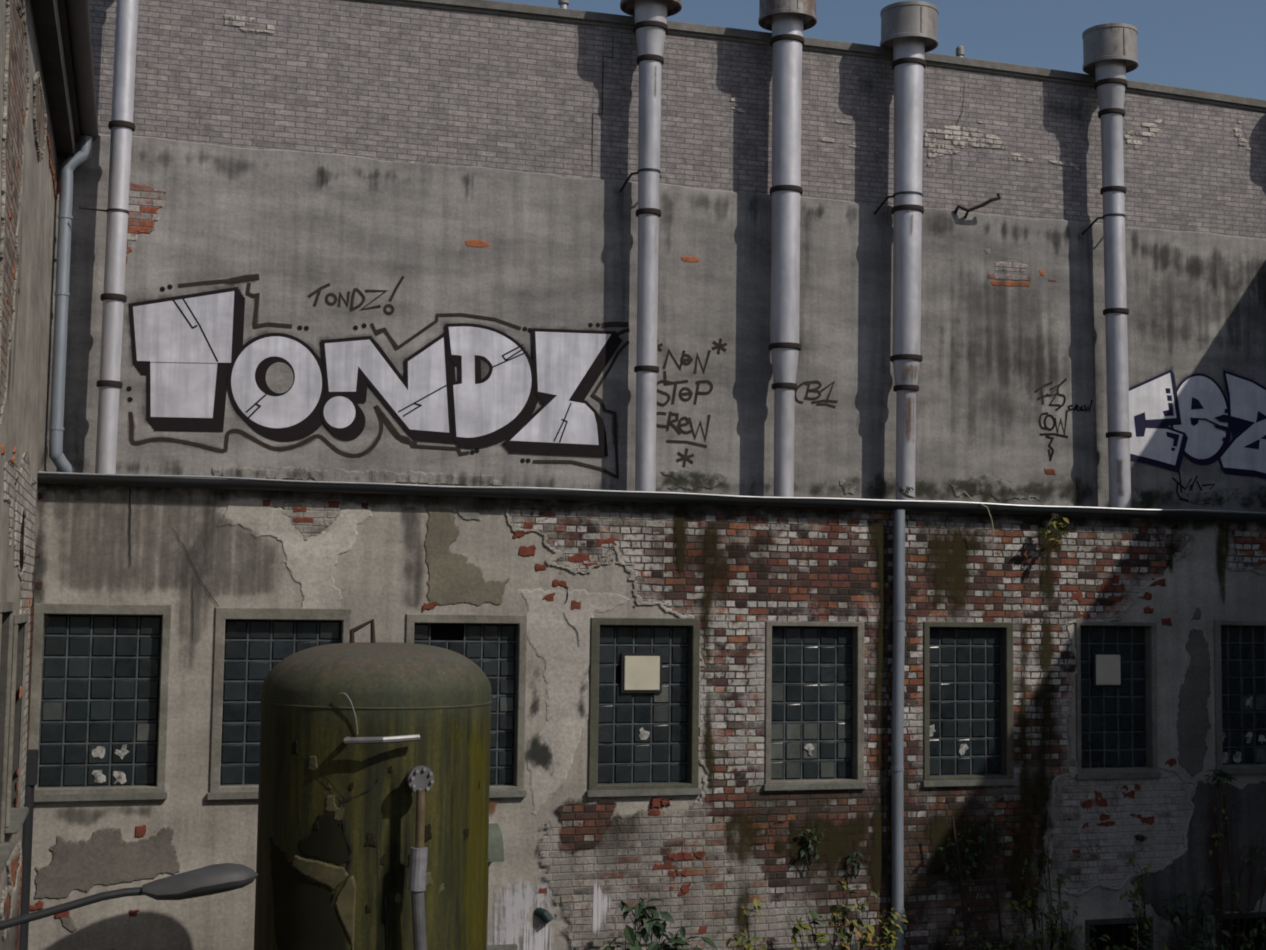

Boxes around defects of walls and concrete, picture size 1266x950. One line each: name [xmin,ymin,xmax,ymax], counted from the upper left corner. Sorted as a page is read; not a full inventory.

flaking render [0,0,58,427]
flaking render [126,182,166,264]
leakage [1133,236,1266,305]
peeling [211,466,504,609]
flaking render [1,443,43,808]
spalling [421,601,437,613]
flaking render [504,468,1197,950]
spalling [0,825,70,950]
spalling [135,825,147,838]